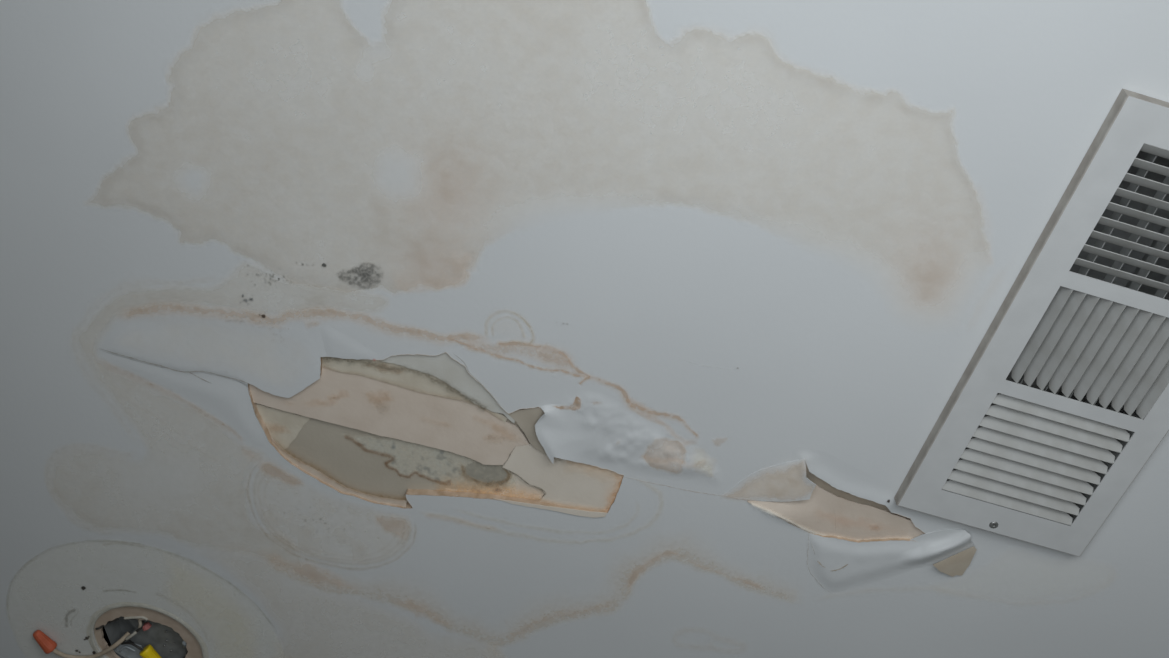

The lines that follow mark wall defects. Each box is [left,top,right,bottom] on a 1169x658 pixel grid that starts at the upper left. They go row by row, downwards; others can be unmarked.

mould [339,264,380,288]
spalling [248,352,624,518]
spalling [721,459,977,577]